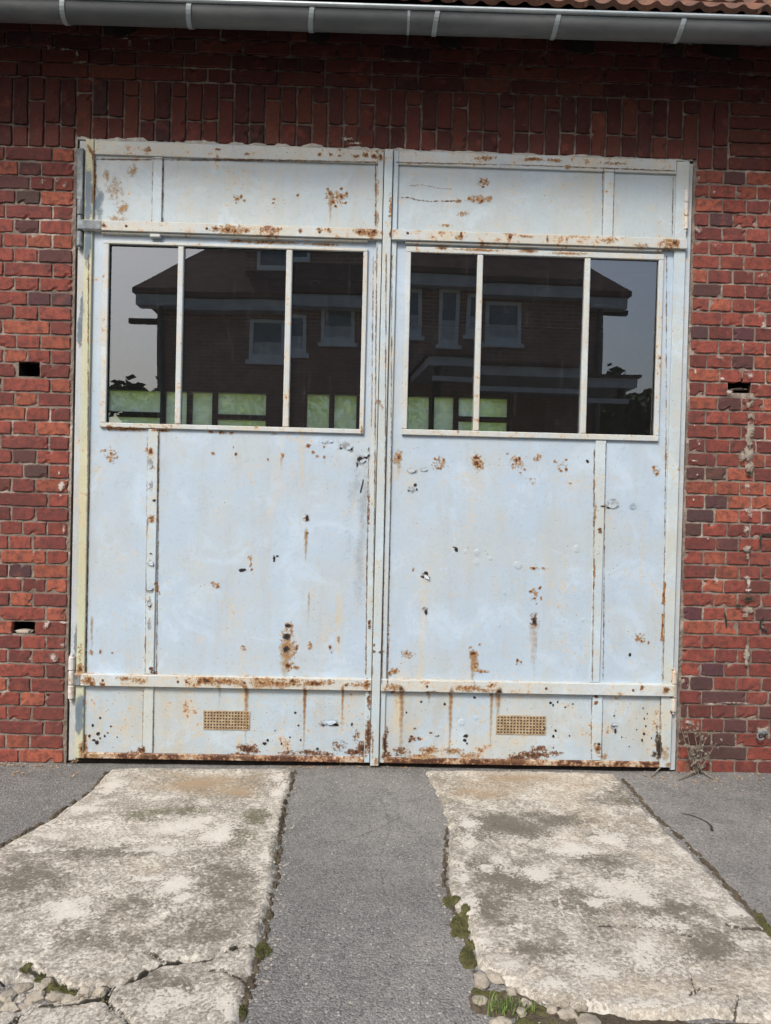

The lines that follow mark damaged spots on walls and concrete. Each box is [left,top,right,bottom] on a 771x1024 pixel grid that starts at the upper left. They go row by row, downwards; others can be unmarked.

corrosion [326,187,348,210]
corrosion [352,178,587,255]
corrosion [211,224,339,246]
corrosion [663,239,680,251]
corrosion [471,454,484,471]
corrosion [505,453,542,480]
corrosion [195,622,564,797]
corrosion [72,734,99,763]
corrosion [127,747,154,759]
crack [0,944,255,1024]